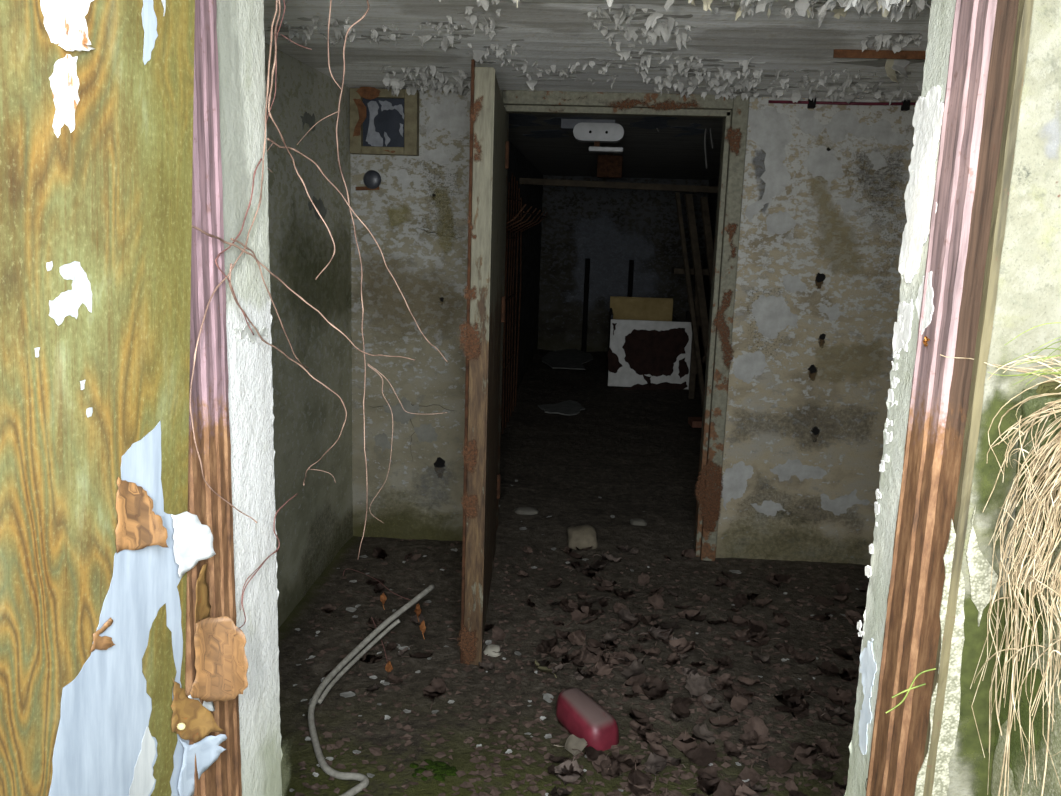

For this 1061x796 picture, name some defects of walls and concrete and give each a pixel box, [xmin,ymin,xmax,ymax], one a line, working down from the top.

peeling [40,0,95,138]
corrosion [469,96,483,161]
corrosion [727,127,742,156]
water stain [753,151,768,211]
peeling [267,0,944,472]
corrosion [727,223,738,258]
peeling [46,261,92,326]
corrosion [713,289,734,368]
corrosion [695,459,723,532]
peeling [865,543,874,578]
peeling [48,421,249,796]